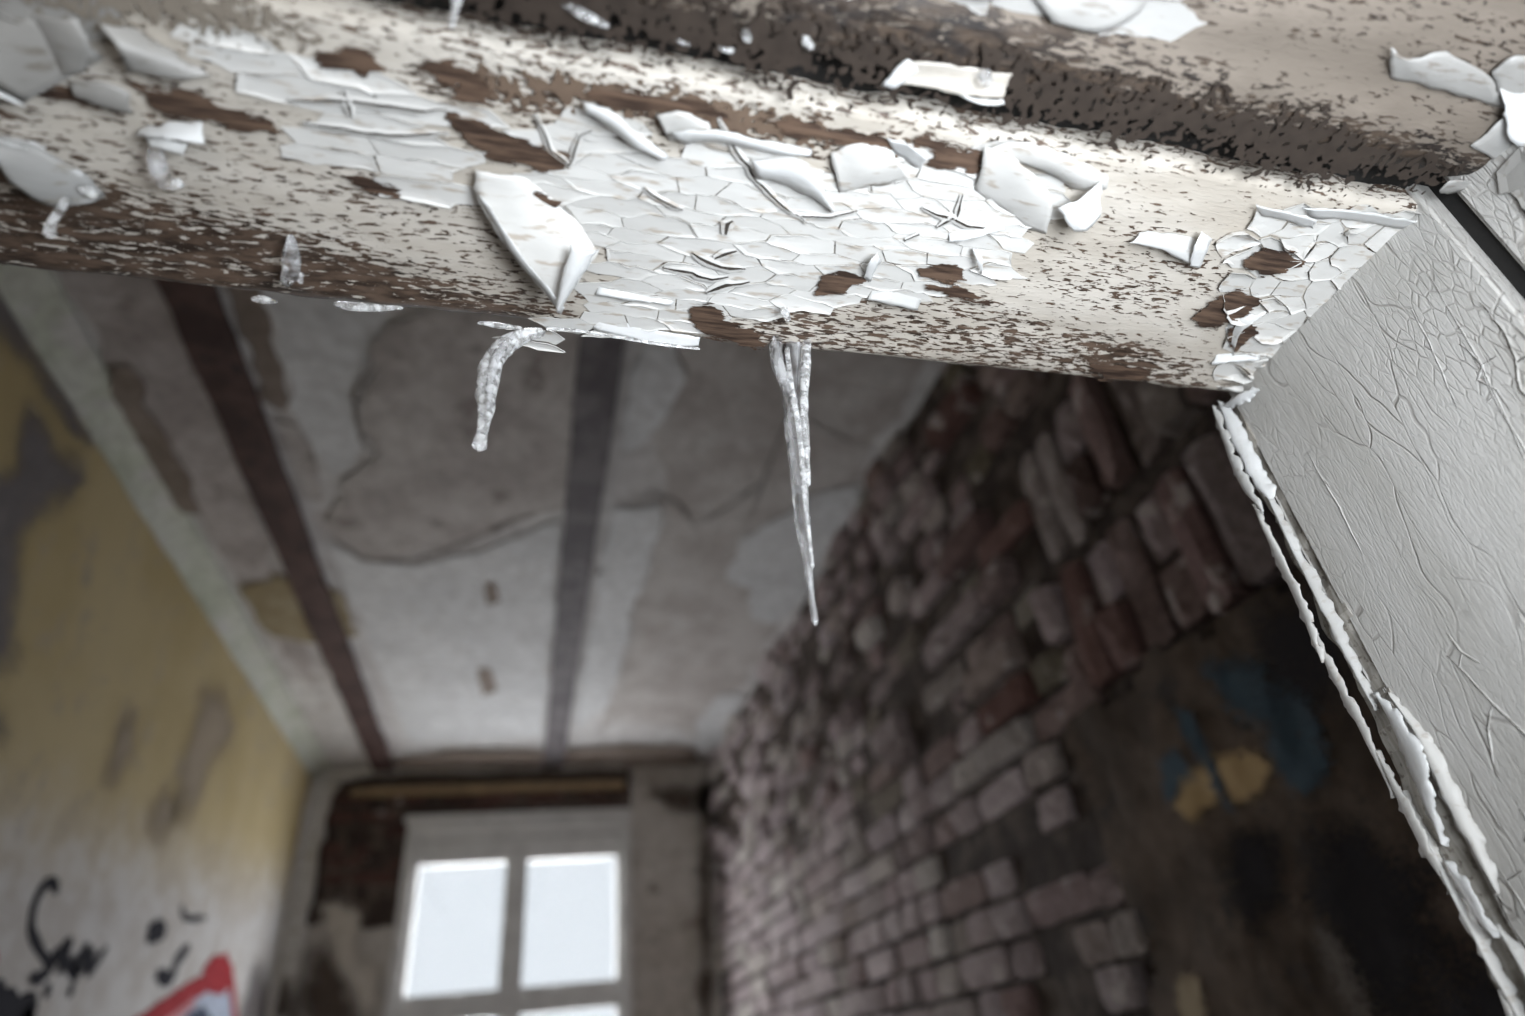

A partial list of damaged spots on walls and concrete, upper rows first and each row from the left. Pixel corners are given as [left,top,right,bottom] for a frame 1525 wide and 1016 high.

peeling [950,0,1208,42]
peeling [1390,47,1525,210]
crack [1510,193,1525,217]
peeling [0,0,1109,769]
damp [780,307,791,322]
crack [1410,275,1525,460]
crack [1275,496,1327,595]
crack [1446,633,1525,765]
crack [1464,808,1525,948]